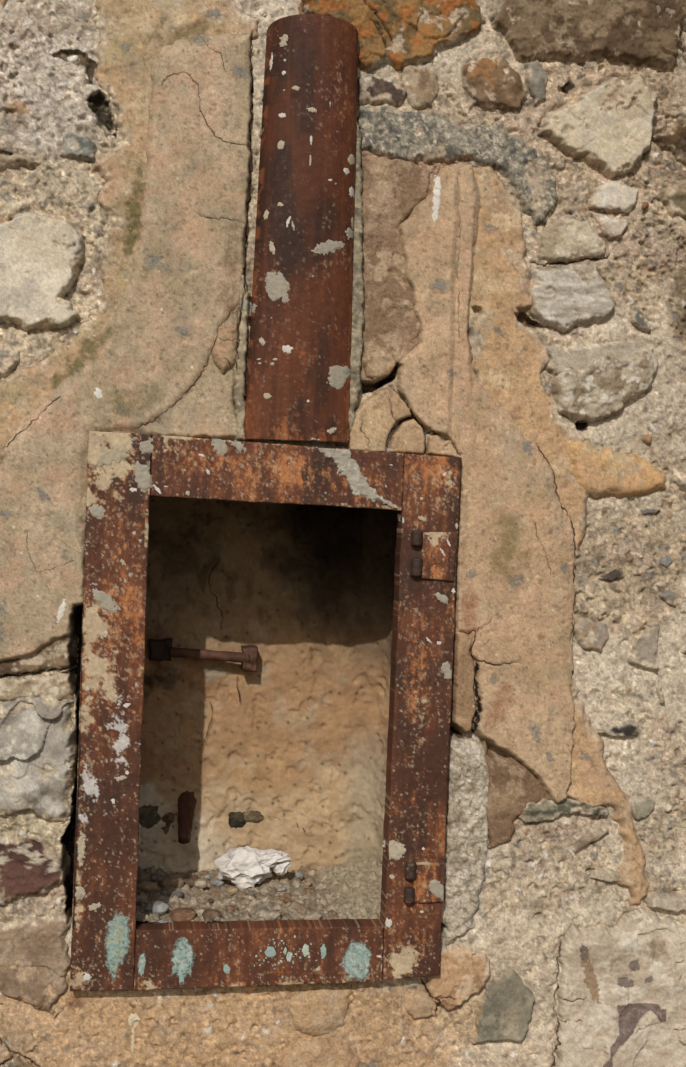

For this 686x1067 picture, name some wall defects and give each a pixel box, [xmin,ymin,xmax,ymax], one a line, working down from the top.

crack [138,33,254,428]
crack [538,446,576,640]
crack [458,620,516,734]
crack [0,1039,37,1066]